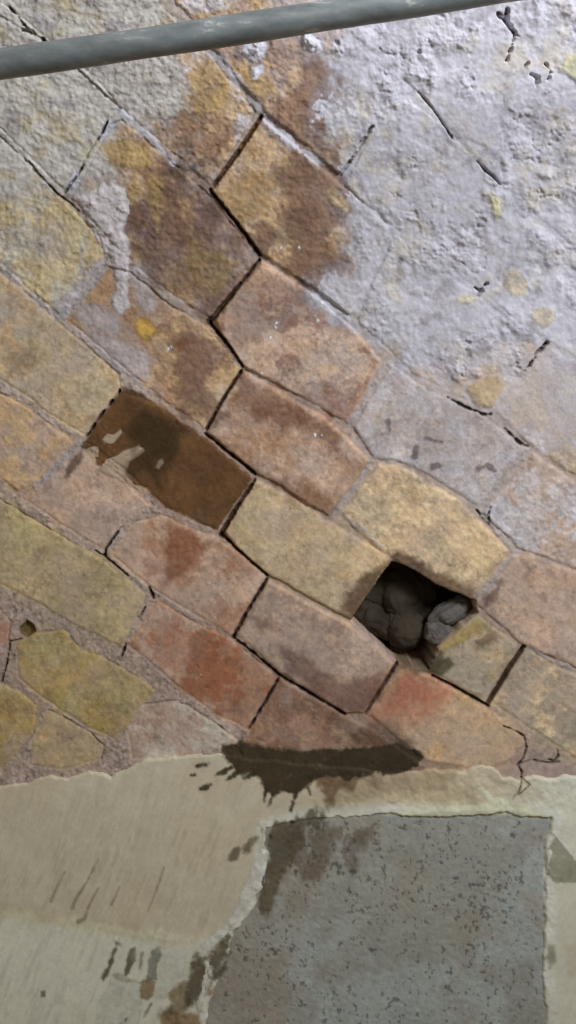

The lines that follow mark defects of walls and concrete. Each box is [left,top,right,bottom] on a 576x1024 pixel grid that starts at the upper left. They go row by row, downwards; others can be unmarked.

leakage [0,0,576,529]
spalling [353,561,472,650]
leakage [190,740,424,824]
crack [504,726,558,792]
flaking render [542,828,576,921]